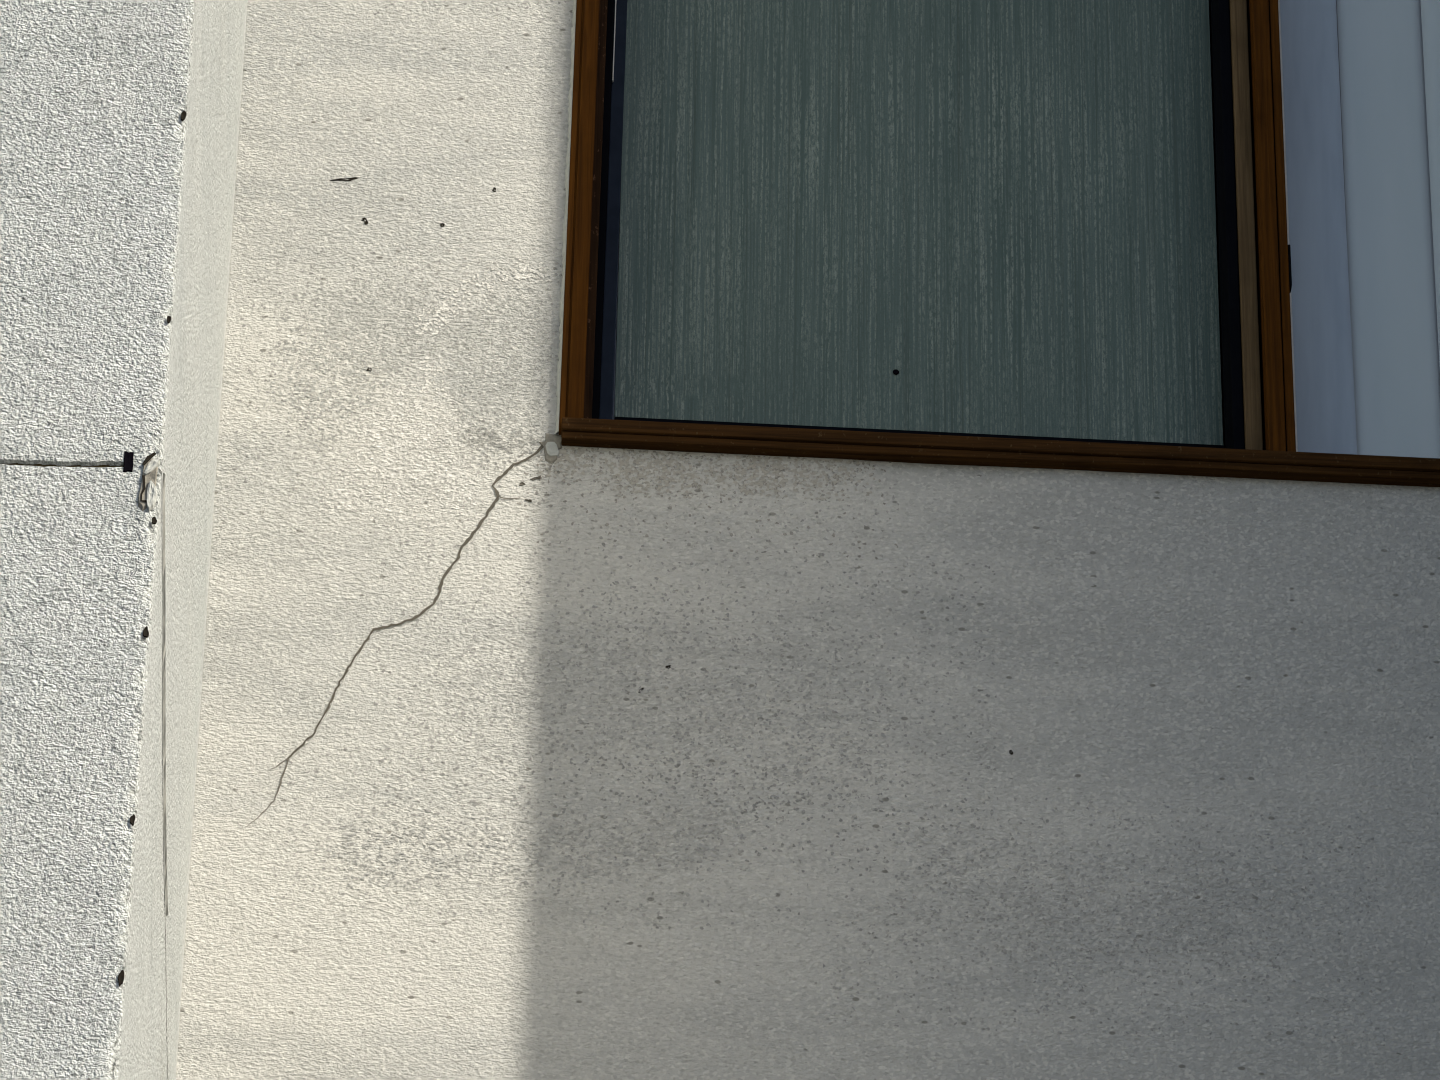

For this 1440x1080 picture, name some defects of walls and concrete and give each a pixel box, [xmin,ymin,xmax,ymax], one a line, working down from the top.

spalling [138,452,160,524]
crack [251,434,555,823]